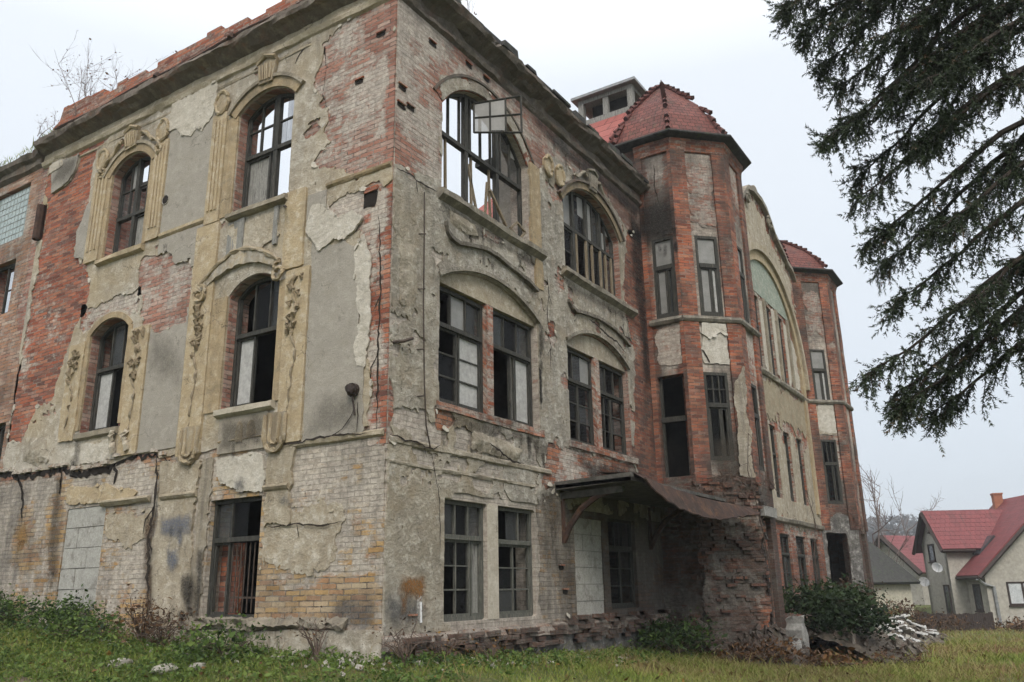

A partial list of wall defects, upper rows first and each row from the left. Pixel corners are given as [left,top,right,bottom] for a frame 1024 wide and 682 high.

flaking render [0,139,192,486]
crack [283,217,441,559]
flaking render [305,0,674,659]
peeling [701,322,728,339]
crack [0,448,170,608]
peeling [216,451,266,492]
crack [268,521,345,536]
rust [401,578,425,608]
rust [602,472,761,521]
spalling [693,472,775,651]